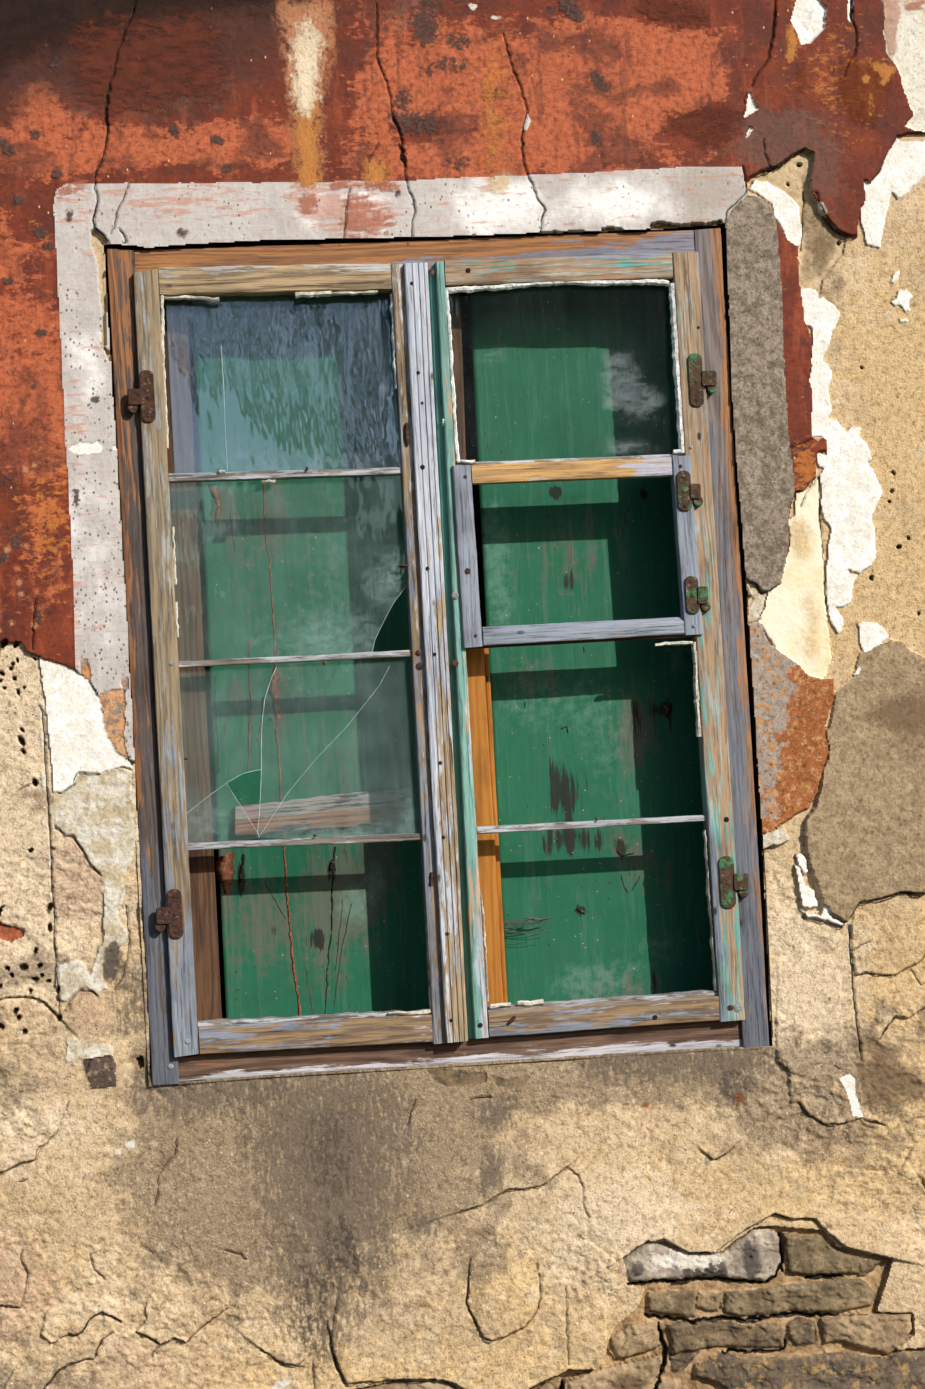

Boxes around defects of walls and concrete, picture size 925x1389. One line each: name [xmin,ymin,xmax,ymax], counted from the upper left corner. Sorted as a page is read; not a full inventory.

water stain [276,0,336,187]
corrosion [784,24,805,88]
corrosion [299,193,319,214]
corrosion [332,156,399,237]
peeling [744,0,925,928]
peeling [0,622,138,1021]
crack [817,892,925,1060]
peeling [66,1038,116,1089]
water stain [134,1069,441,1359]
crack [44,1308,228,1389]
flaking render [530,1226,925,1389]
crack [624,1214,842,1389]